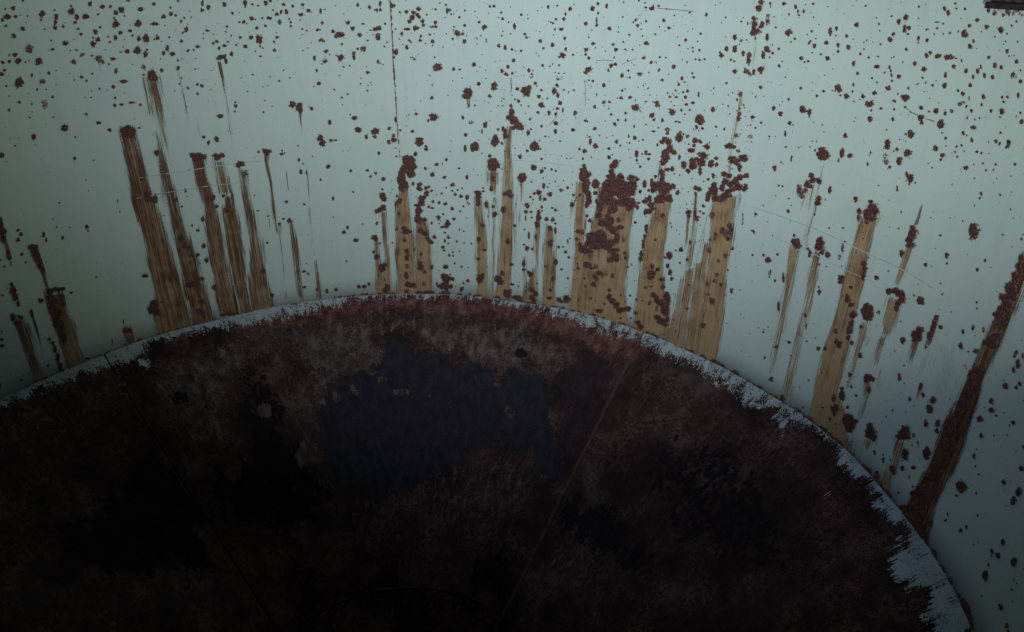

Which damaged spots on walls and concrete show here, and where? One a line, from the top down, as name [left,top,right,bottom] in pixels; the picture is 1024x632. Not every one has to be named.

corrosion [203,0,467,135]
corrosion [607,15,706,82]
corrosion [908,383,937,427]
corrosion [1002,350,1024,401]
peeling [0,293,970,632]